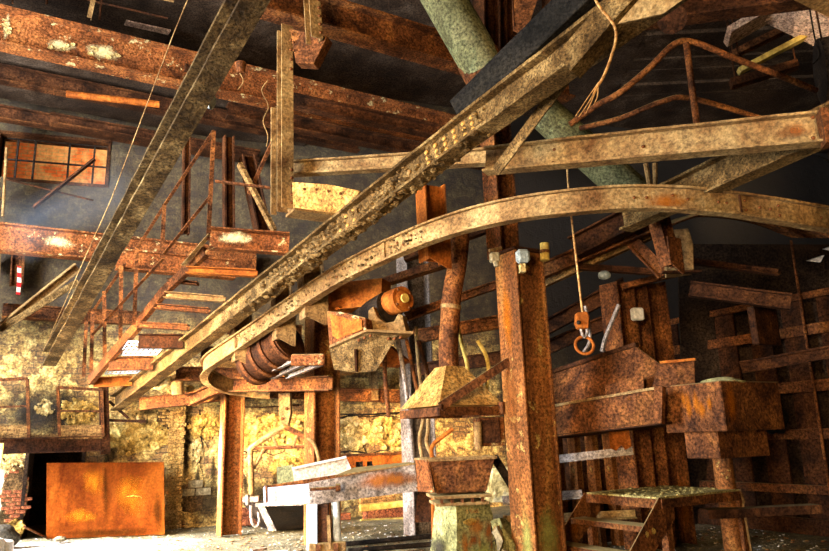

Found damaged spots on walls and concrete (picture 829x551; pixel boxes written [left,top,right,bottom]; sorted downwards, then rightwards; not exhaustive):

rust [221,233,247,242]